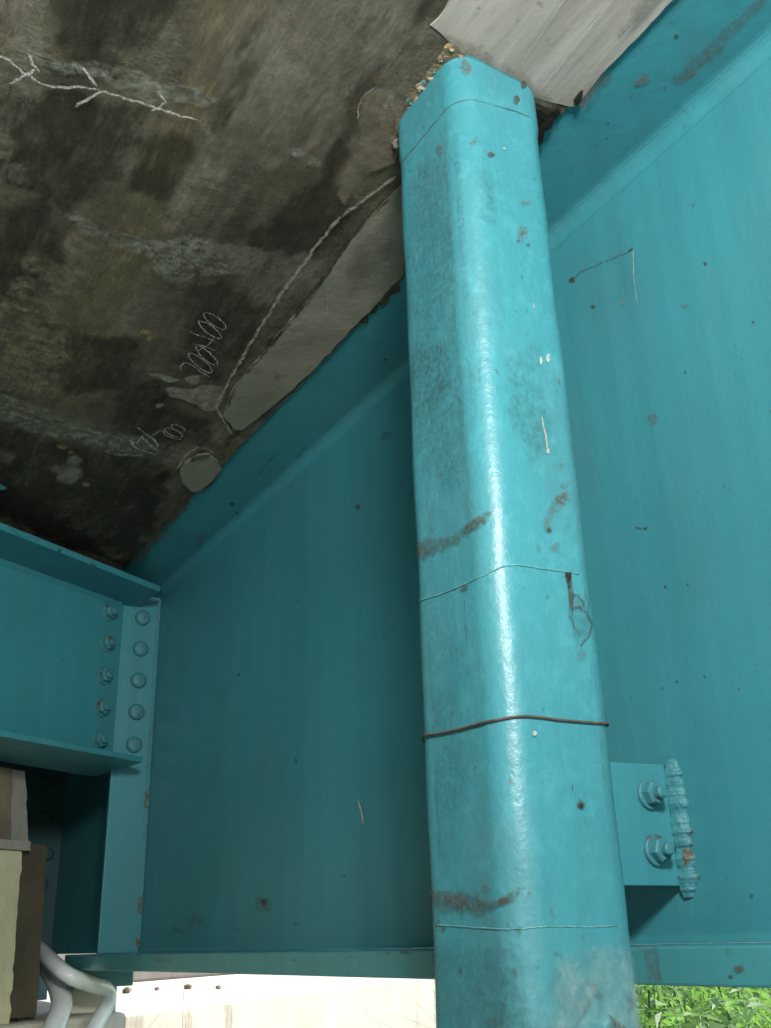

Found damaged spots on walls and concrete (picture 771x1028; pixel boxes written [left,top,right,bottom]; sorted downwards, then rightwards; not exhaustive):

leakage [0,0,434,564]
crack [100,194,392,406]